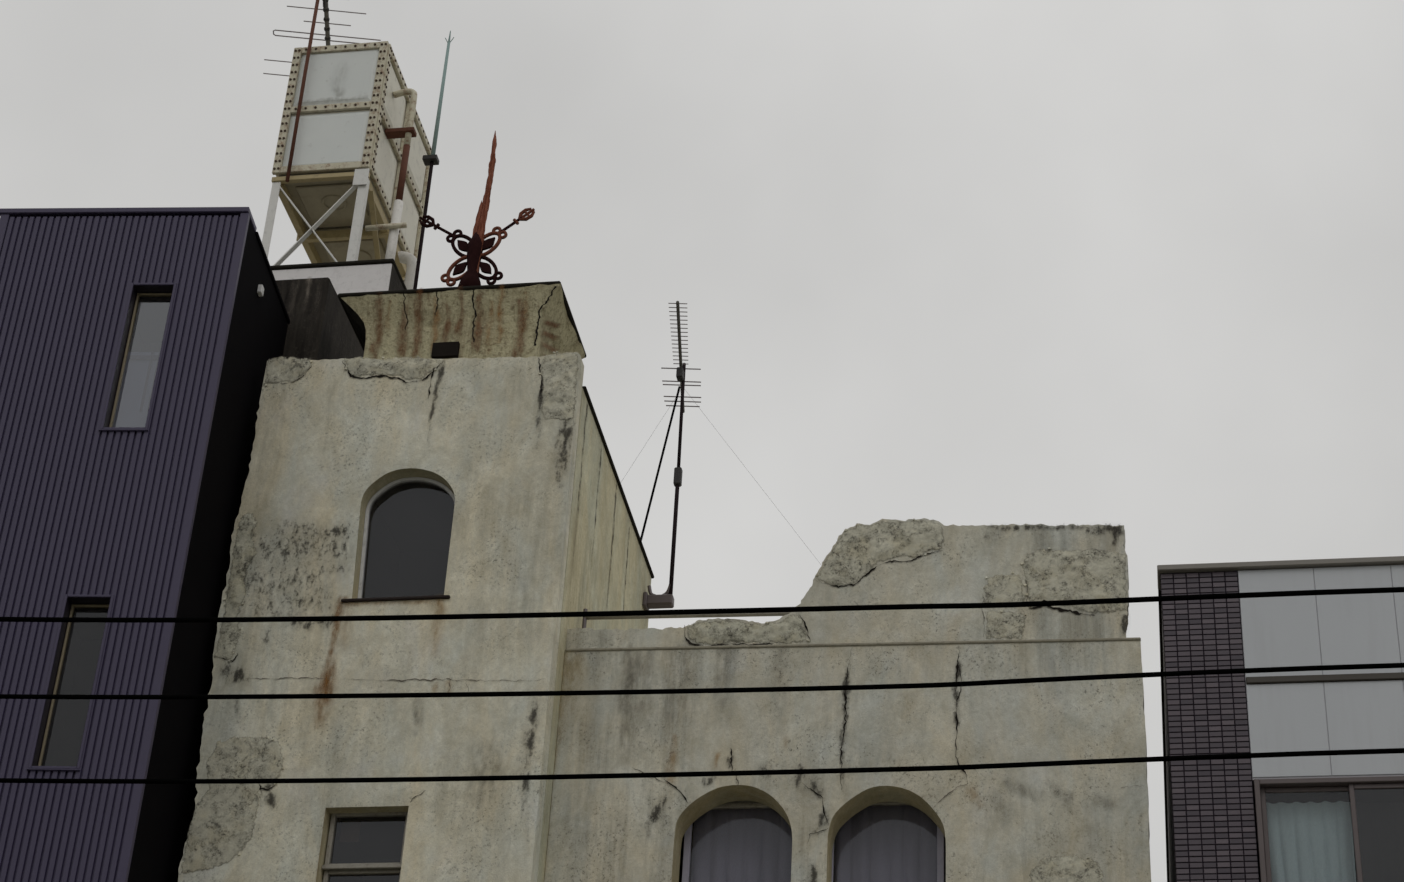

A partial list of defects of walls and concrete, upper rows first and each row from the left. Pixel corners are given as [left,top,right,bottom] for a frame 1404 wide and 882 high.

rust [399,287,503,355]
water stain [243,524,349,617]
spalling [684,614,810,646]
spalling [815,519,944,588]
spalling [982,572,1027,639]
crack [806,657,850,841]
crack [934,651,968,807]
spalling [182,736,284,874]